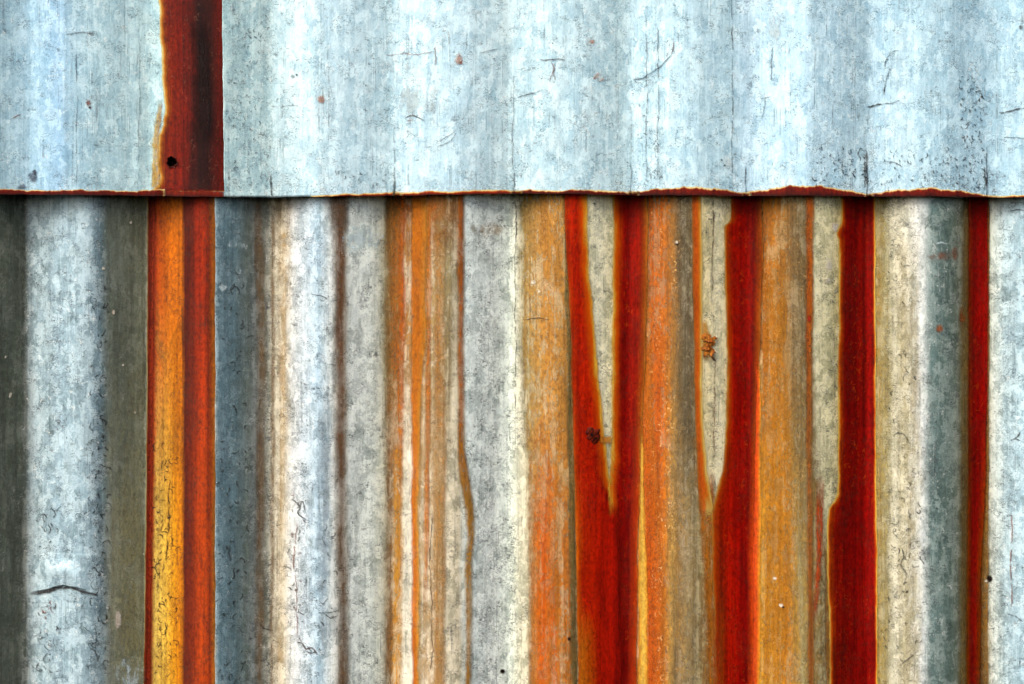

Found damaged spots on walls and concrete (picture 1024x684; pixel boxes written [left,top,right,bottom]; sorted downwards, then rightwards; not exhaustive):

rust [0,0,224,684]
rust [311,185,1024,684]